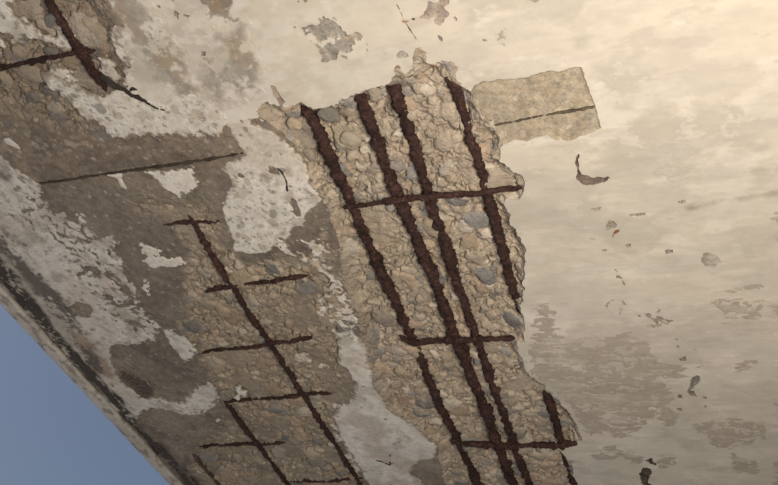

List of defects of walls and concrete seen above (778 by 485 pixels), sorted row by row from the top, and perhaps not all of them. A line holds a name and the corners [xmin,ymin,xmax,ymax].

water stain [0,235,197,485]
spalling [0,0,509,485]
spalling [319,47,701,485]